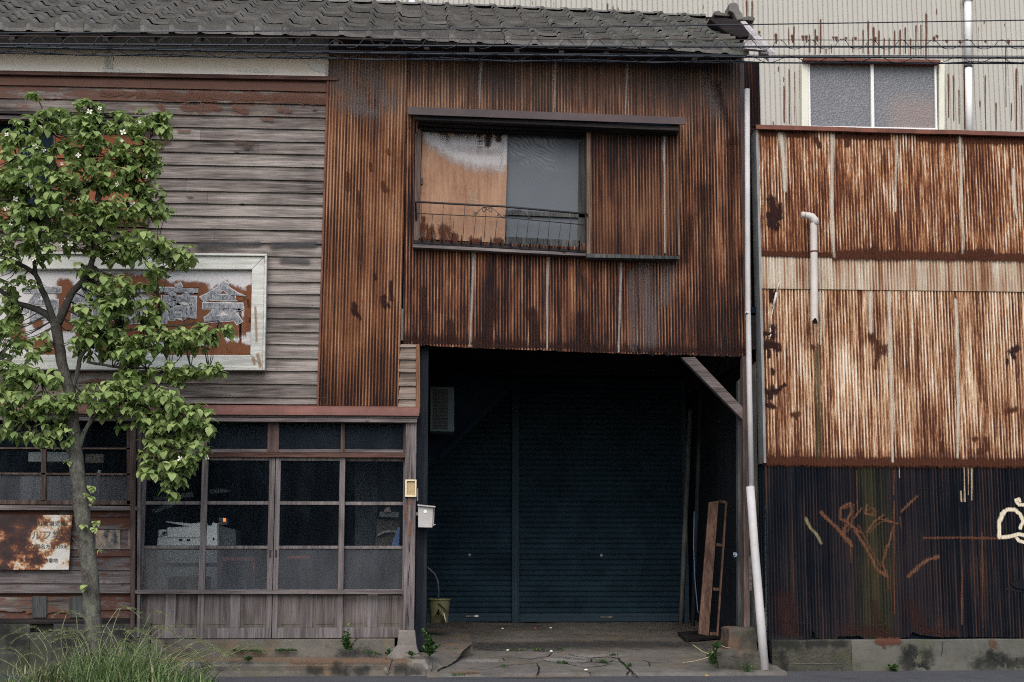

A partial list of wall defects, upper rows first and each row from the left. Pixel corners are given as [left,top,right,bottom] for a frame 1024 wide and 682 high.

corrosion [775,9,961,55]
corrosion [759,66,822,149]
corrosion [918,41,1024,146]
corrosion [835,133,891,147]
corrosion [403,83,744,356]
corrosion [766,195,783,231]
corrosion [763,247,1024,263]
corrosion [763,324,786,409]
corrosion [868,332,888,370]
corrosion [1006,344,1020,365]
corrosion [762,436,1024,552]
crack [481,647,661,677]